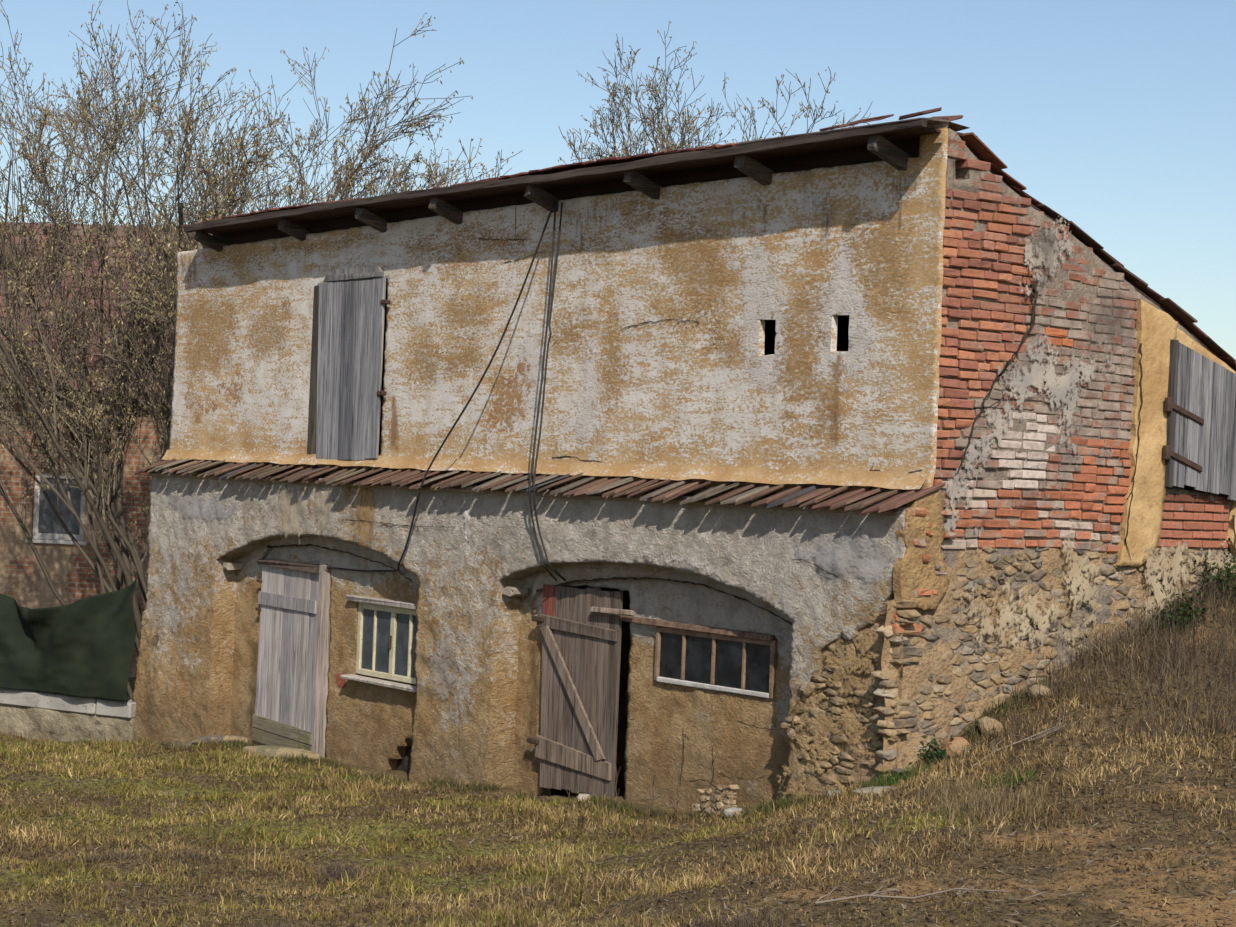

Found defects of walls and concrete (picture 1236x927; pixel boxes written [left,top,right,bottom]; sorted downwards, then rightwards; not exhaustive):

peeling [180,233,373,422]
peeling [405,225,629,462]
peeling [567,195,915,448]
crack [958,272,1040,471]
flaking render [932,139,1141,558]
peeling [795,530,894,582]
spalling [397,747,411,773]
spalling [780,597,924,801]